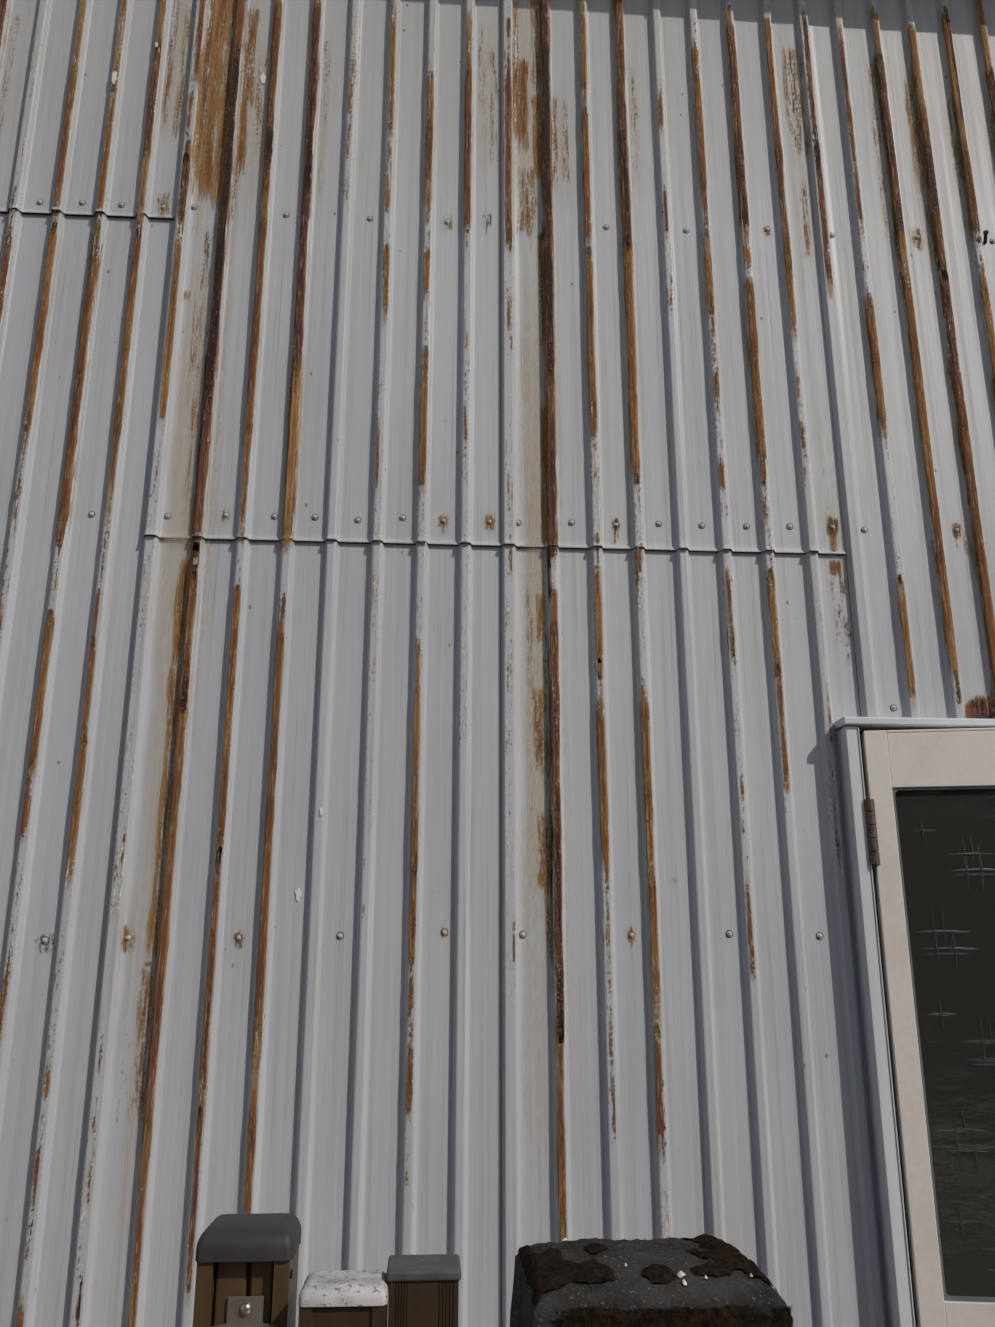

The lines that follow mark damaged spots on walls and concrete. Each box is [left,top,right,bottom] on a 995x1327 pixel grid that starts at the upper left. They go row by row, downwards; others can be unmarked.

rust [25,1022,55,1258]
rust [64,0,286,1327]
rust [282,0,330,548]
rust [403,598,422,1181]
rust [416,29,448,577]
rust [447,0,647,1242]
rust [641,678,666,1162]
rust [689,20,727,512]
rust [720,546,740,730]
rust [726,4,789,813]
rust [764,2,833,336]
rust [835,23,889,459]